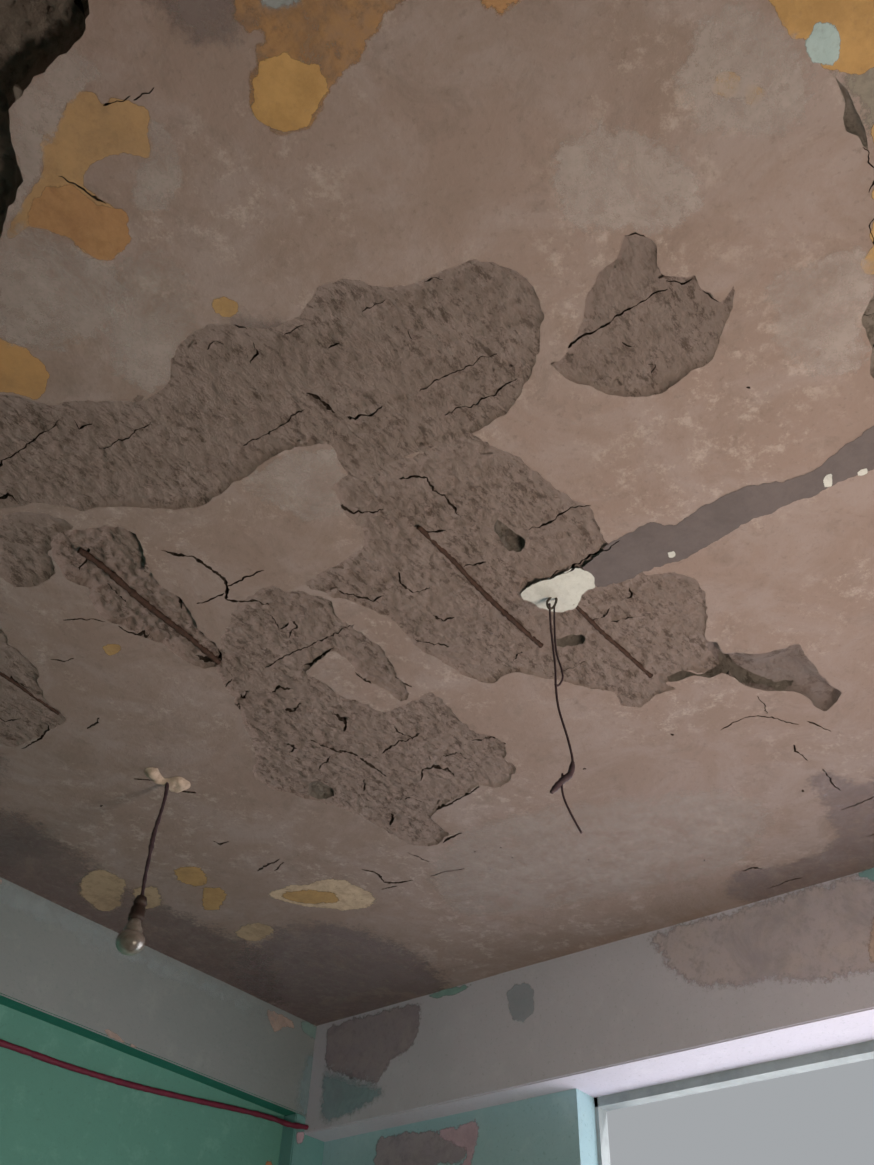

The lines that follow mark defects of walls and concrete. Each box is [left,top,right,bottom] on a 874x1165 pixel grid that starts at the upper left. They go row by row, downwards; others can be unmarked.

peeling [0,0,151,261]
water stain [554,123,702,232]
water stain [676,7,806,132]
peeling [769,0,874,149]
flaking render [551,232,735,397]
flaking render [861,294,874,378]
crack [161,550,269,605]
flaking render [0,259,842,847]
flaking render [267,1004,420,1083]
flaking render [374,1121,479,1165]